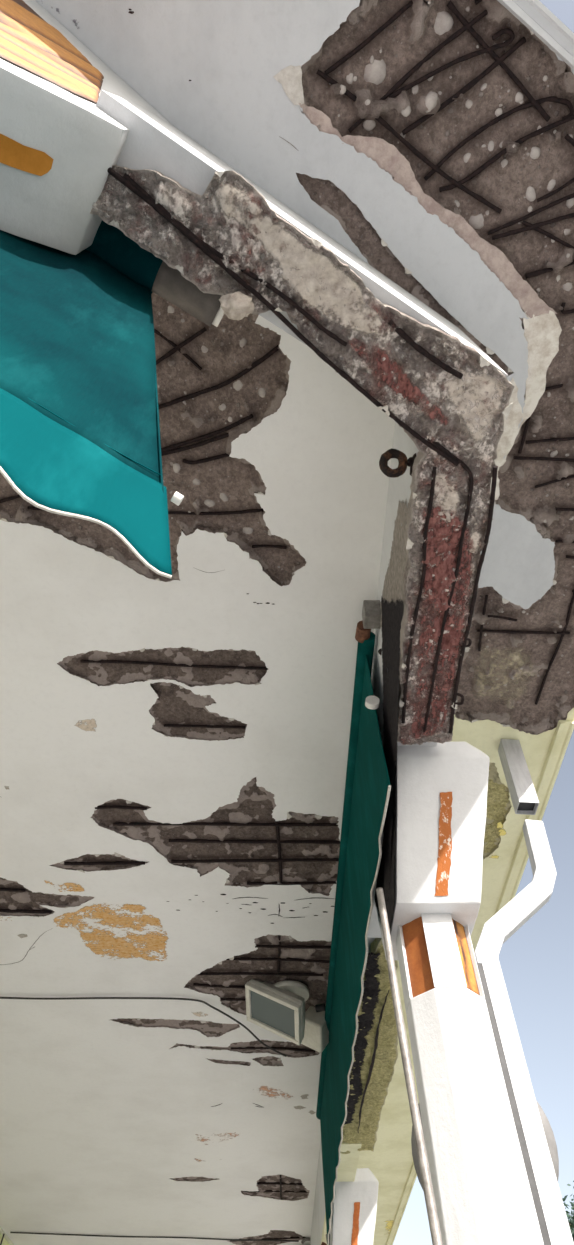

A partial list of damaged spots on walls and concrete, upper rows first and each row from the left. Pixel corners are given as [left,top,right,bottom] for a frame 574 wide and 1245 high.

spalling [0,0,574,745]
rust [350,340,448,425]
rust [411,506,474,739]
spalling [0,777,340,1067]
mould [343,952,381,1128]
spalling [229,1230,306,1245]
spalling [241,1175,310,1201]